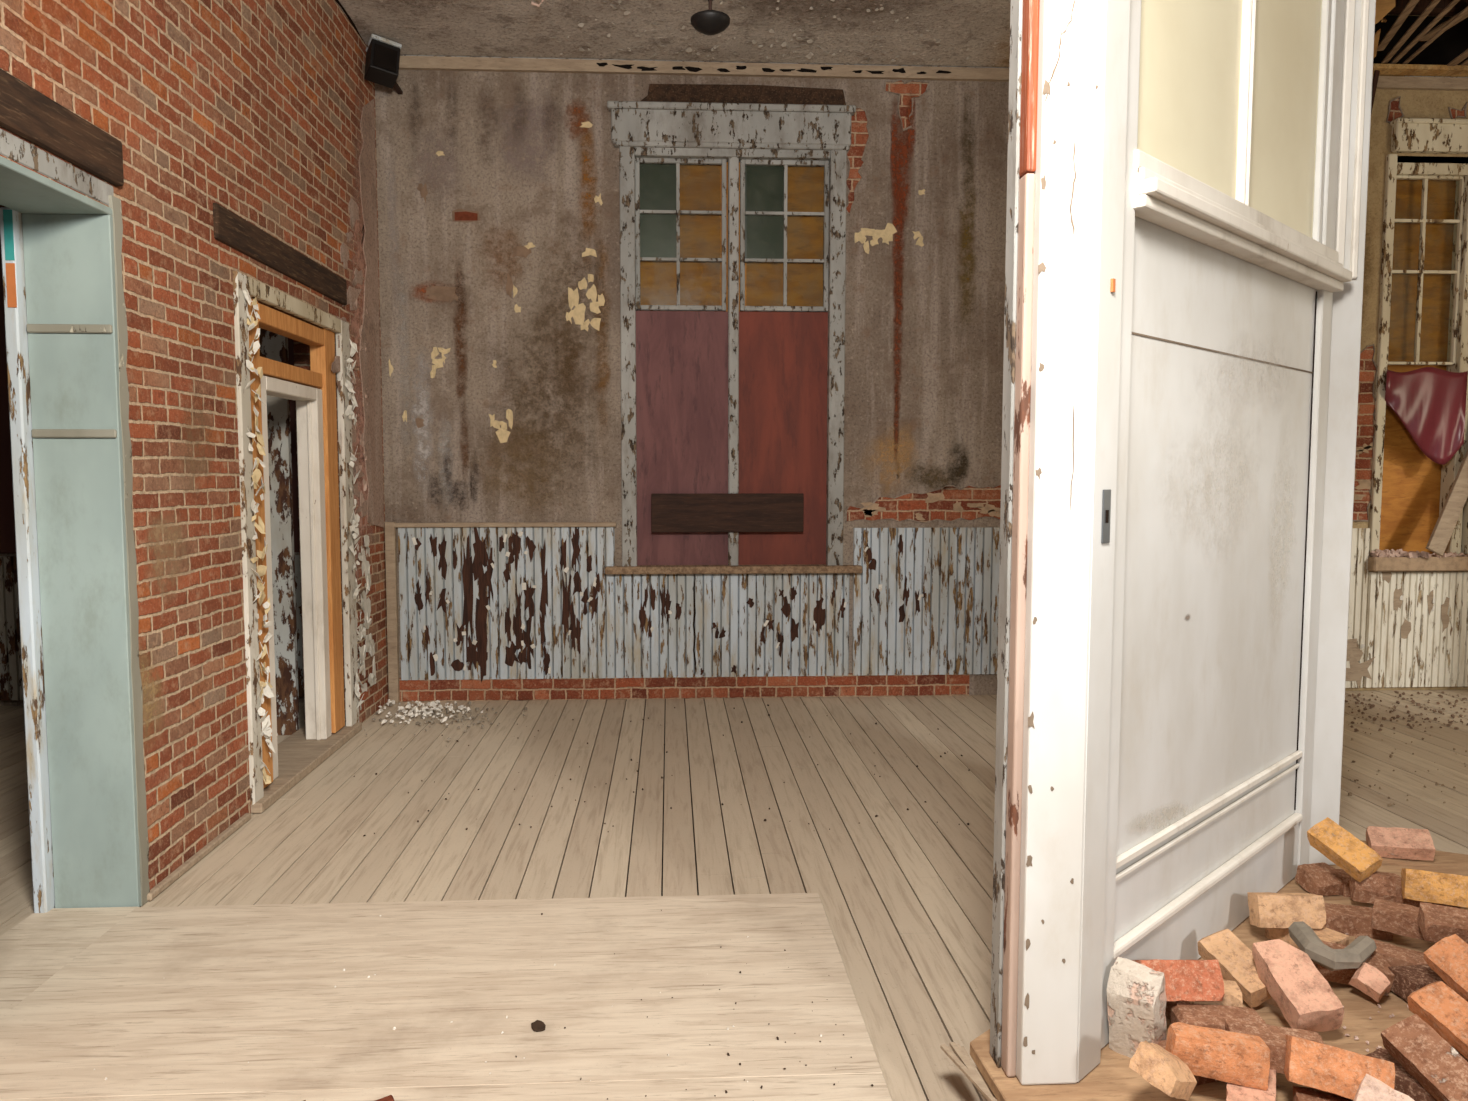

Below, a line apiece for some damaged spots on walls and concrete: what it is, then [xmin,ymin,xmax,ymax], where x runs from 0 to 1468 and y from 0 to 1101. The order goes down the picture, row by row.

spalling [1373,15,1468,65]
spalling [846,107,924,254]
damp [454,272,466,396]
peeling [566,248,605,331]
rust [890,100,915,452]
damp [399,295,477,504]
spalling [1353,344,1378,522]
spalling [845,485,1001,555]
peeling [412,521,600,682]
peeling [639,584,682,638]
peeling [760,586,846,657]
peeling [899,575,926,622]